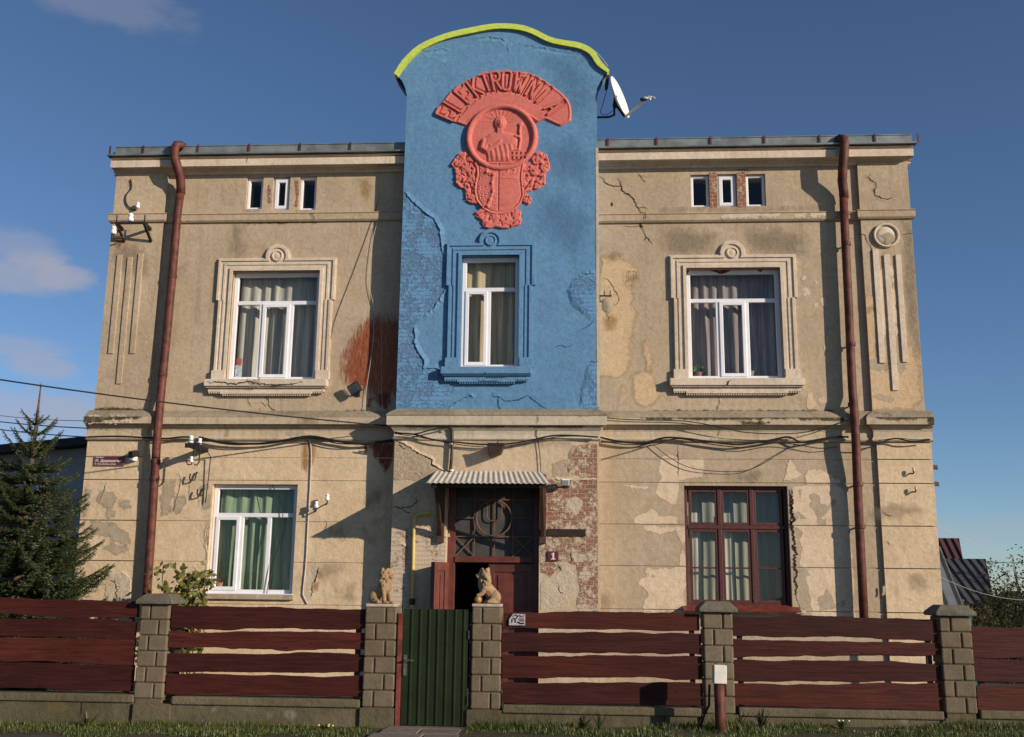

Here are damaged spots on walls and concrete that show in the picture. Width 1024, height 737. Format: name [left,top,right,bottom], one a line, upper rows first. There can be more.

crack [600,173,652,243]
crack [865,172,896,202]
corrosion [338,314,399,409]
spalling [396,190,454,408]
crack [448,372,547,422]
peeling [566,252,659,408]
corrosion [364,444,393,470]
spalling [103,571,133,602]
spalling [540,441,598,611]
peeling [623,454,705,613]
crack [789,488,799,595]
peeling [784,460,855,617]